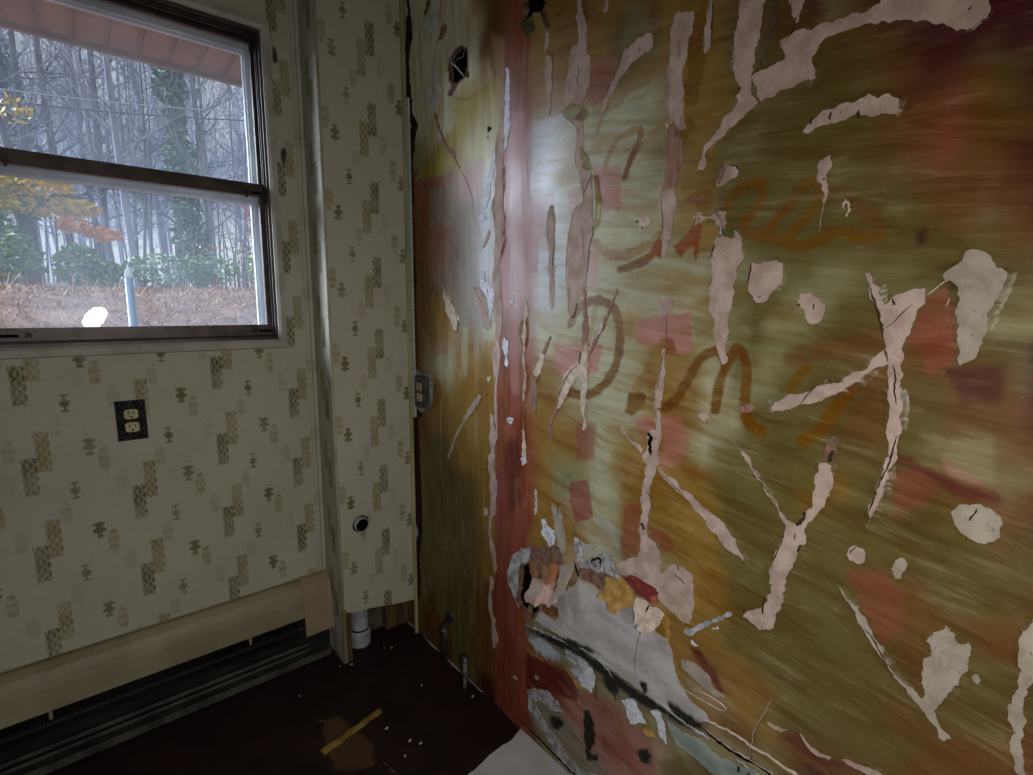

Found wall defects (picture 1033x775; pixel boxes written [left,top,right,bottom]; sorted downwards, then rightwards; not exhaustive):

peeling [635,0,714,257]
peeling [697,0,994,187]
peeling [447,68,604,650]
peeling [520,0,653,460]
peeling [693,206,789,365]
peeling [698,249,1017,535]
peeling [597,348,750,644]
peeling [728,435,840,635]
peeling [951,504,1003,545]
spalling [614,695,667,745]
peeling [837,583,981,742]
peeling [1007,620,1033,775]